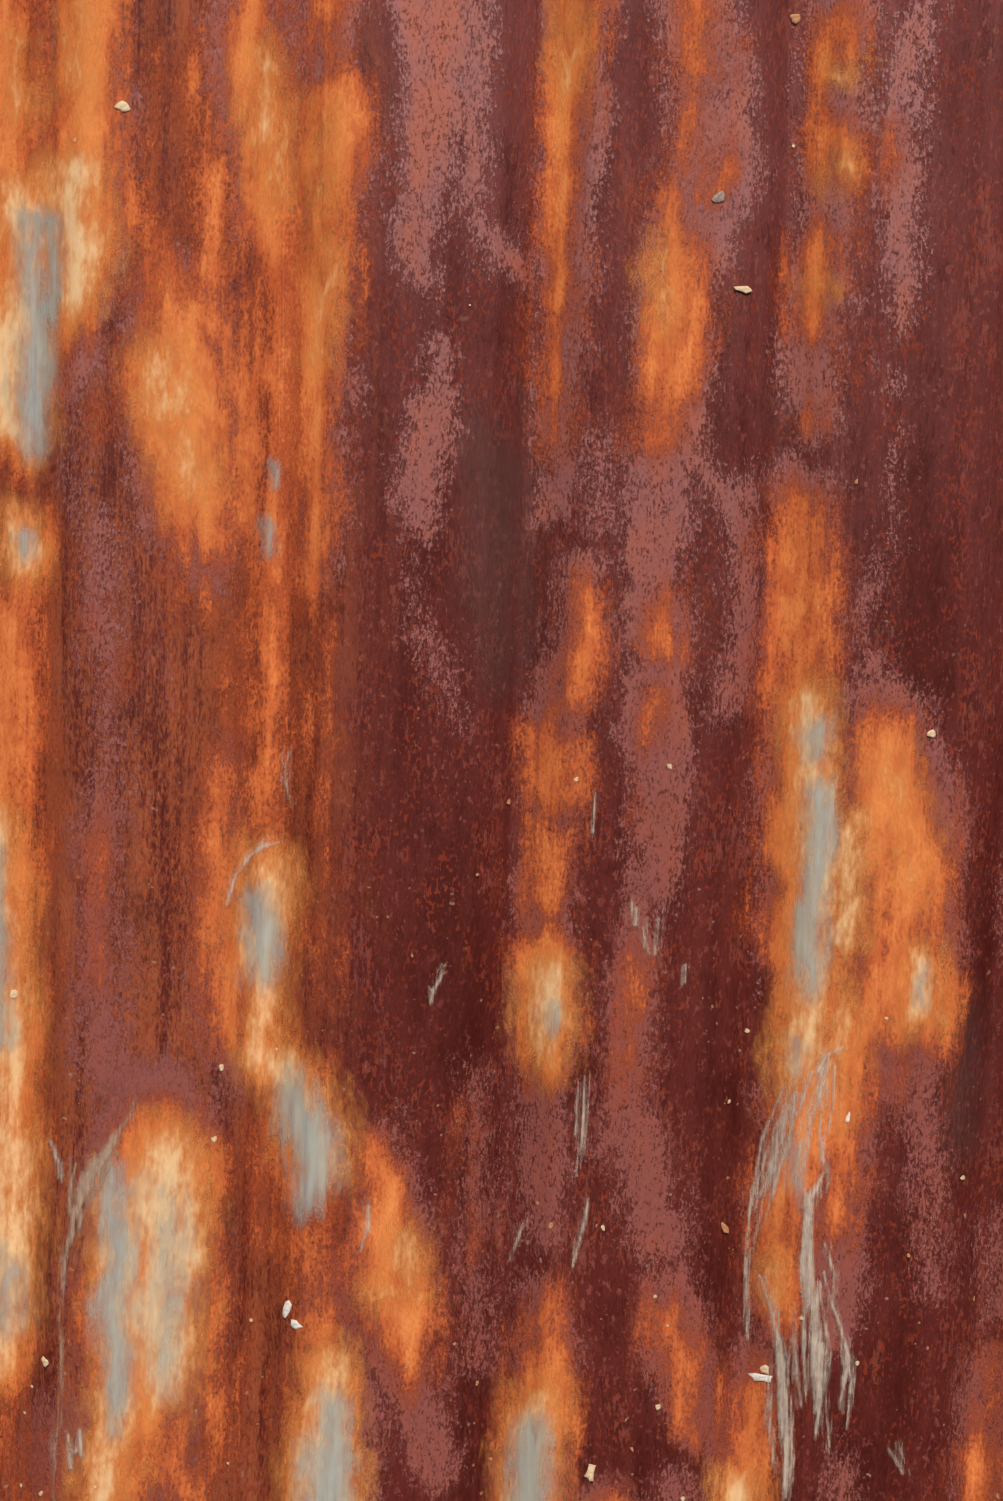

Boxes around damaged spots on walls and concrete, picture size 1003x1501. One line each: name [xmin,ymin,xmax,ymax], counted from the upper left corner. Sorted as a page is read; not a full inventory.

corrosion [864,356,925,426]
corrosion [379,326,479,738]
corrosion [806,1428,870,1501]